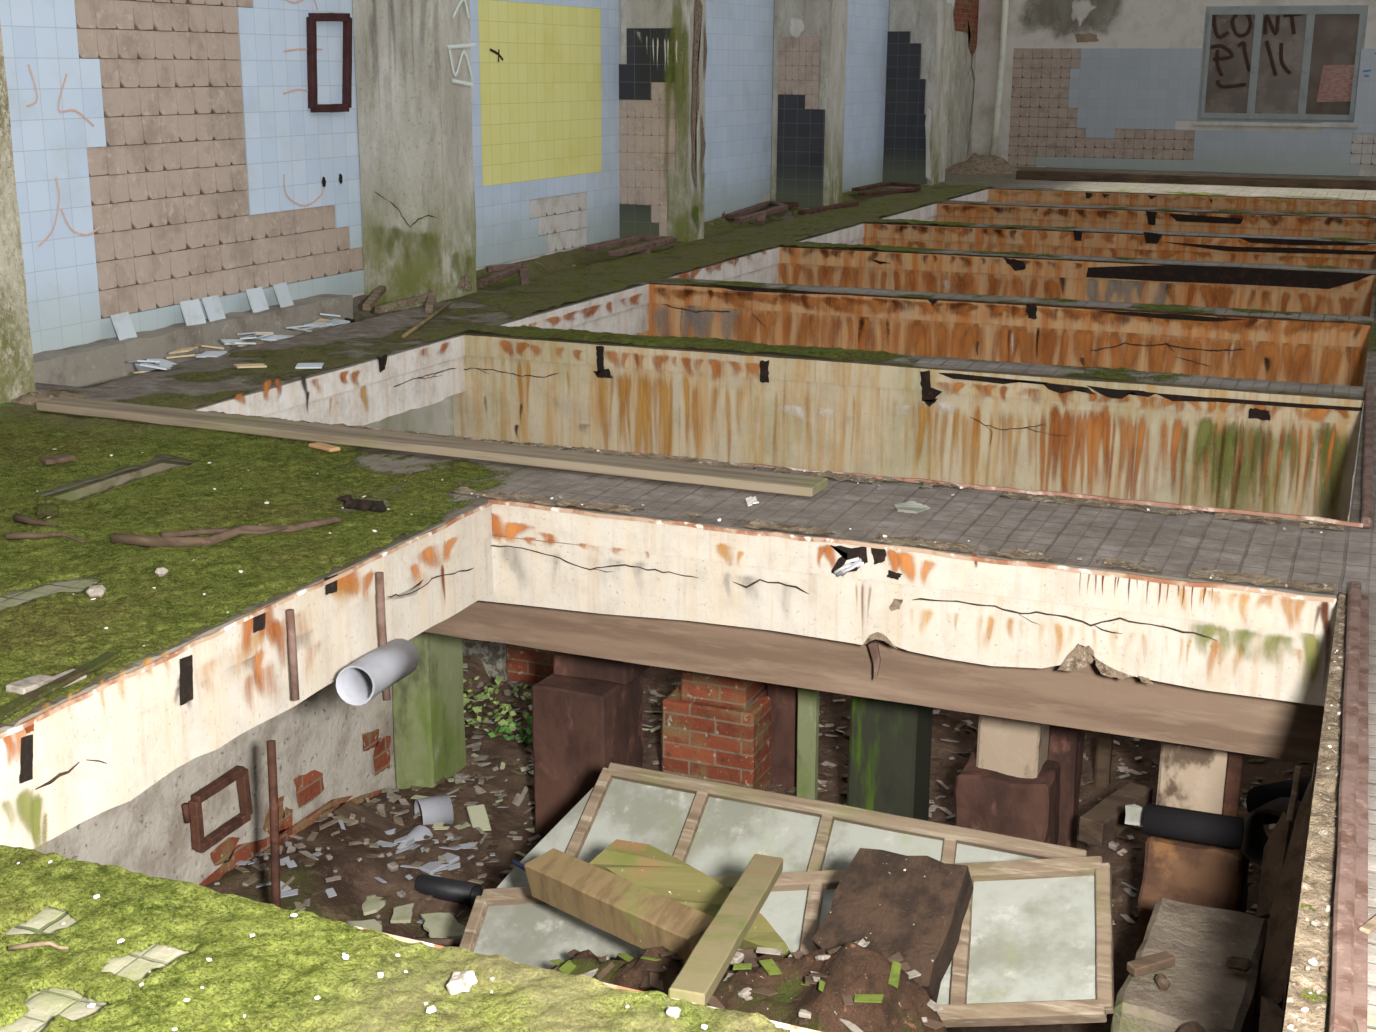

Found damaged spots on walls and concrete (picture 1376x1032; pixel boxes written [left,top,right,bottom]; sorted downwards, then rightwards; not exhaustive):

peeling [1008,0,1195,167]
peeling [74,0,364,319]
corrosion [658,190,1376,386]
corrosion [601,352,760,455]
spalling [192,188,1376,522]
water stain [1195,419,1291,509]
water stain [1308,425,1347,508]
crack [389,545,697,598]
crack [734,579,808,594]
corrosion [888,550,933,580]
corrosion [1282,599,1331,684]
spalling [0,502,1339,886]